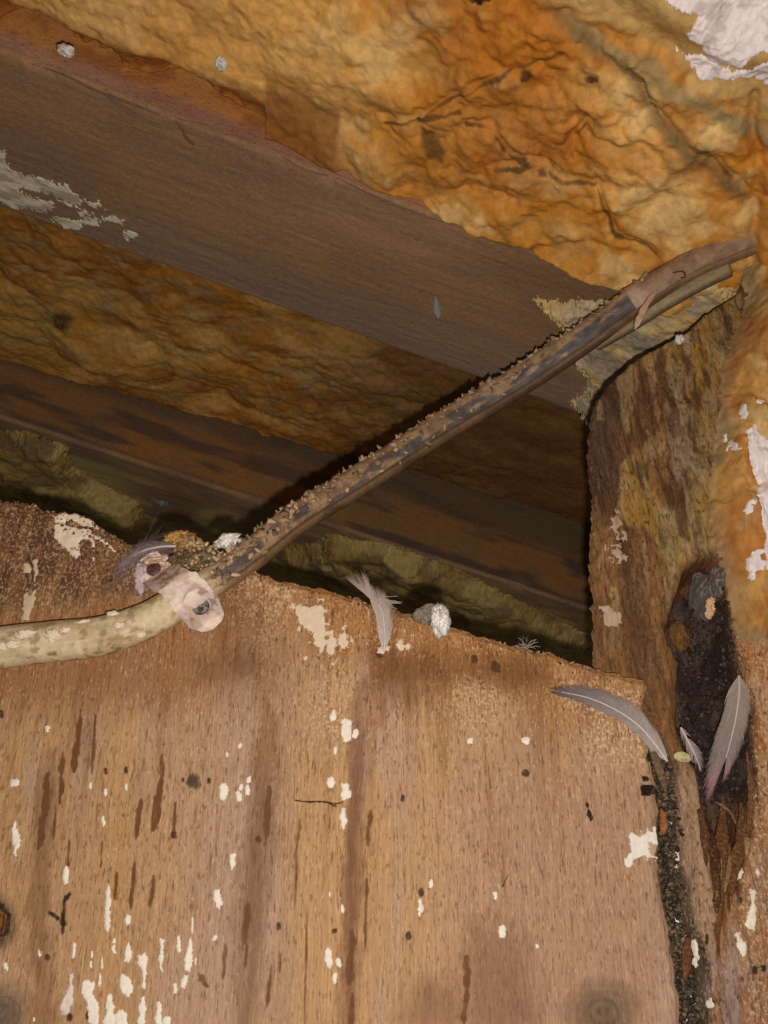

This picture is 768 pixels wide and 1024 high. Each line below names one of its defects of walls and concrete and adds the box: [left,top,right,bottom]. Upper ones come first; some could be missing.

peeling [0,149,138,242]
peeling [723,399,768,580]
peeling [52,512,116,562]
peeling [603,509,628,564]
peeling [288,598,354,667]
peeling [377,638,413,654]
peeling [598,605,622,627]
crack [295,799,343,807]
peeling [624,825,658,867]
peeling [59,883,197,1024]